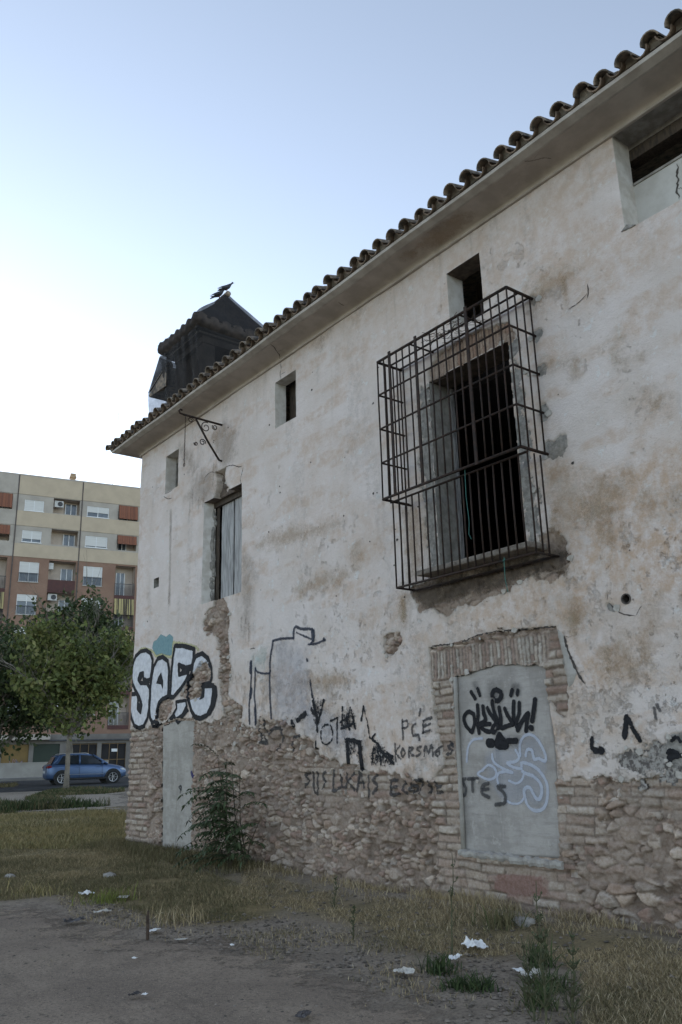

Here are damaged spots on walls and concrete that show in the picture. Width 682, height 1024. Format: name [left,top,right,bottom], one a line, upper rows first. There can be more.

spalling [404,322,574,617]
spalling [125,509,682,936]